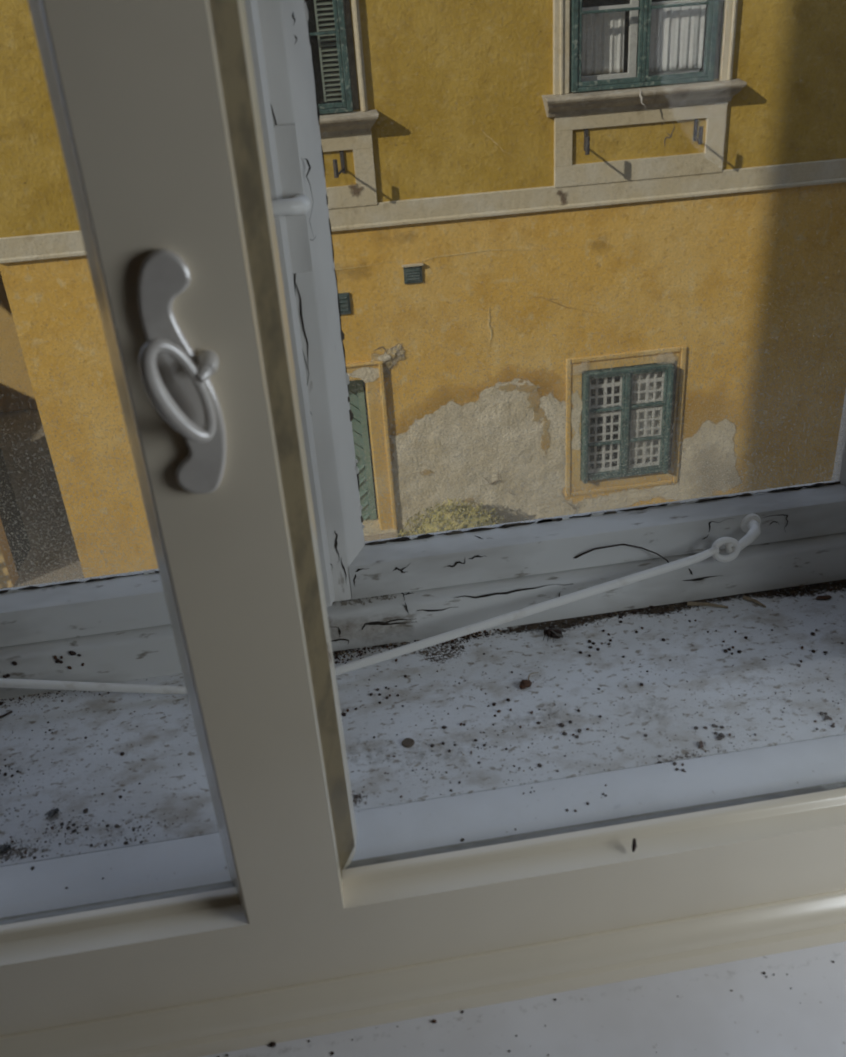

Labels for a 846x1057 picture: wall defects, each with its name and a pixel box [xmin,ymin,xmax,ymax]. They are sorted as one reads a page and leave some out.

spalling [326,195,405,422]
peeling [365,378,841,545]